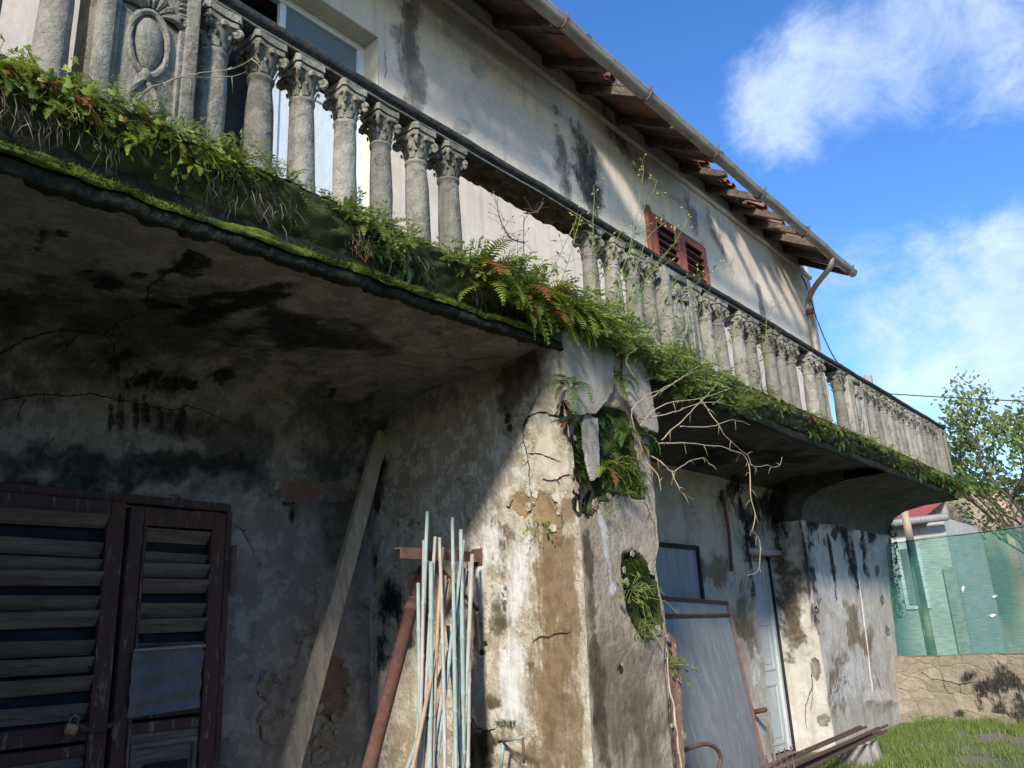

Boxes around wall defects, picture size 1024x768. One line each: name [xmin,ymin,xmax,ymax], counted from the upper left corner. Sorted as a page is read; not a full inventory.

water stain [556,119,603,217]
crack [0,264,205,355]
crack [0,393,250,438]
water stain [0,249,392,493]
crack [518,389,571,517]
peeling [505,329,659,532]
spalling [308,656,353,765]
mould [373,578,405,671]
crack [532,631,573,643]
spalling [621,550,686,768]
water stain [689,443,882,711]
mould [961,661,1024,724]